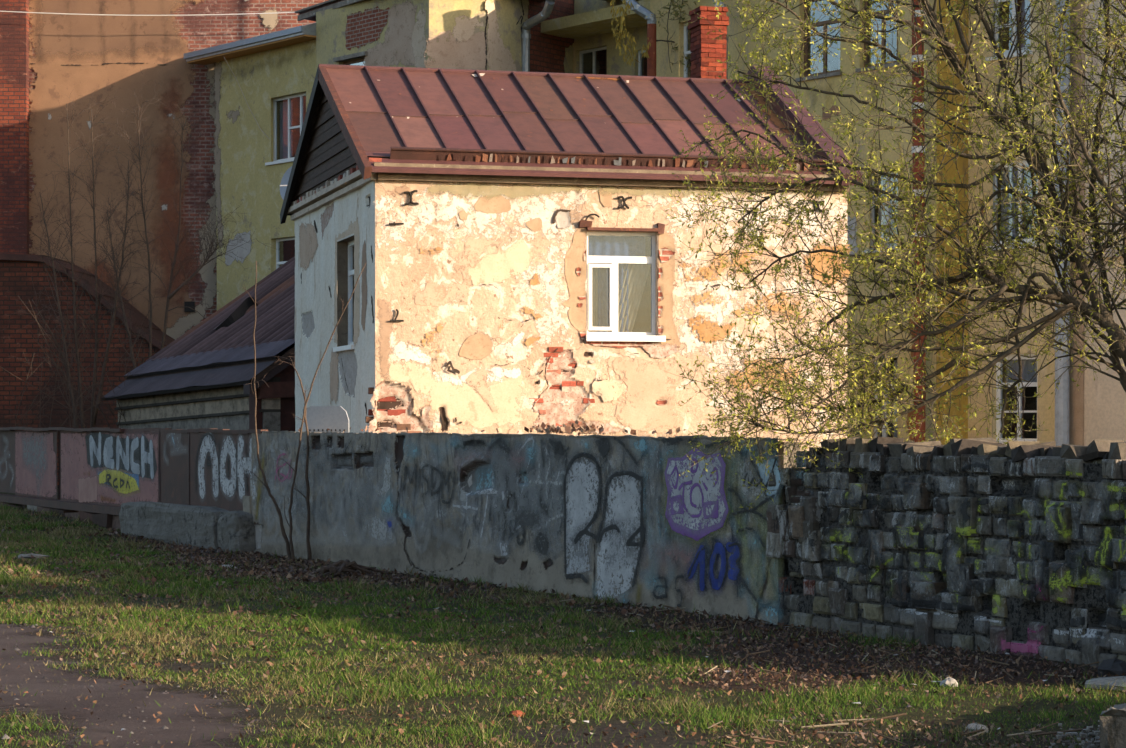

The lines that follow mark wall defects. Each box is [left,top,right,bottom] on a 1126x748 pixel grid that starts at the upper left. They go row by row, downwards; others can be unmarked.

flaking render [166,61,224,340]
peeling [299,184,851,566]